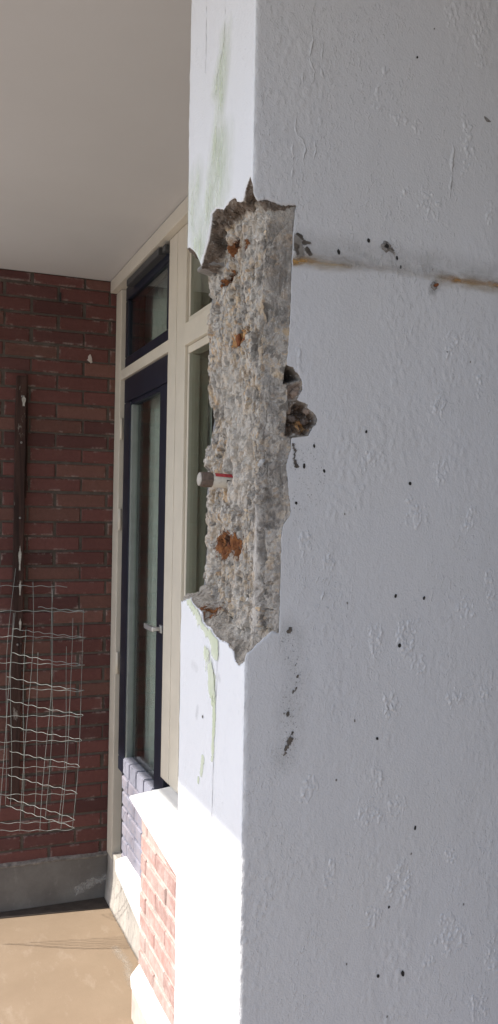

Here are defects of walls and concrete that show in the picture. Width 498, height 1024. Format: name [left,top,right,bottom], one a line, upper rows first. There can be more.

rust [220,237,250,289]
spalling [182,177,317,784]
rust [211,528,243,562]